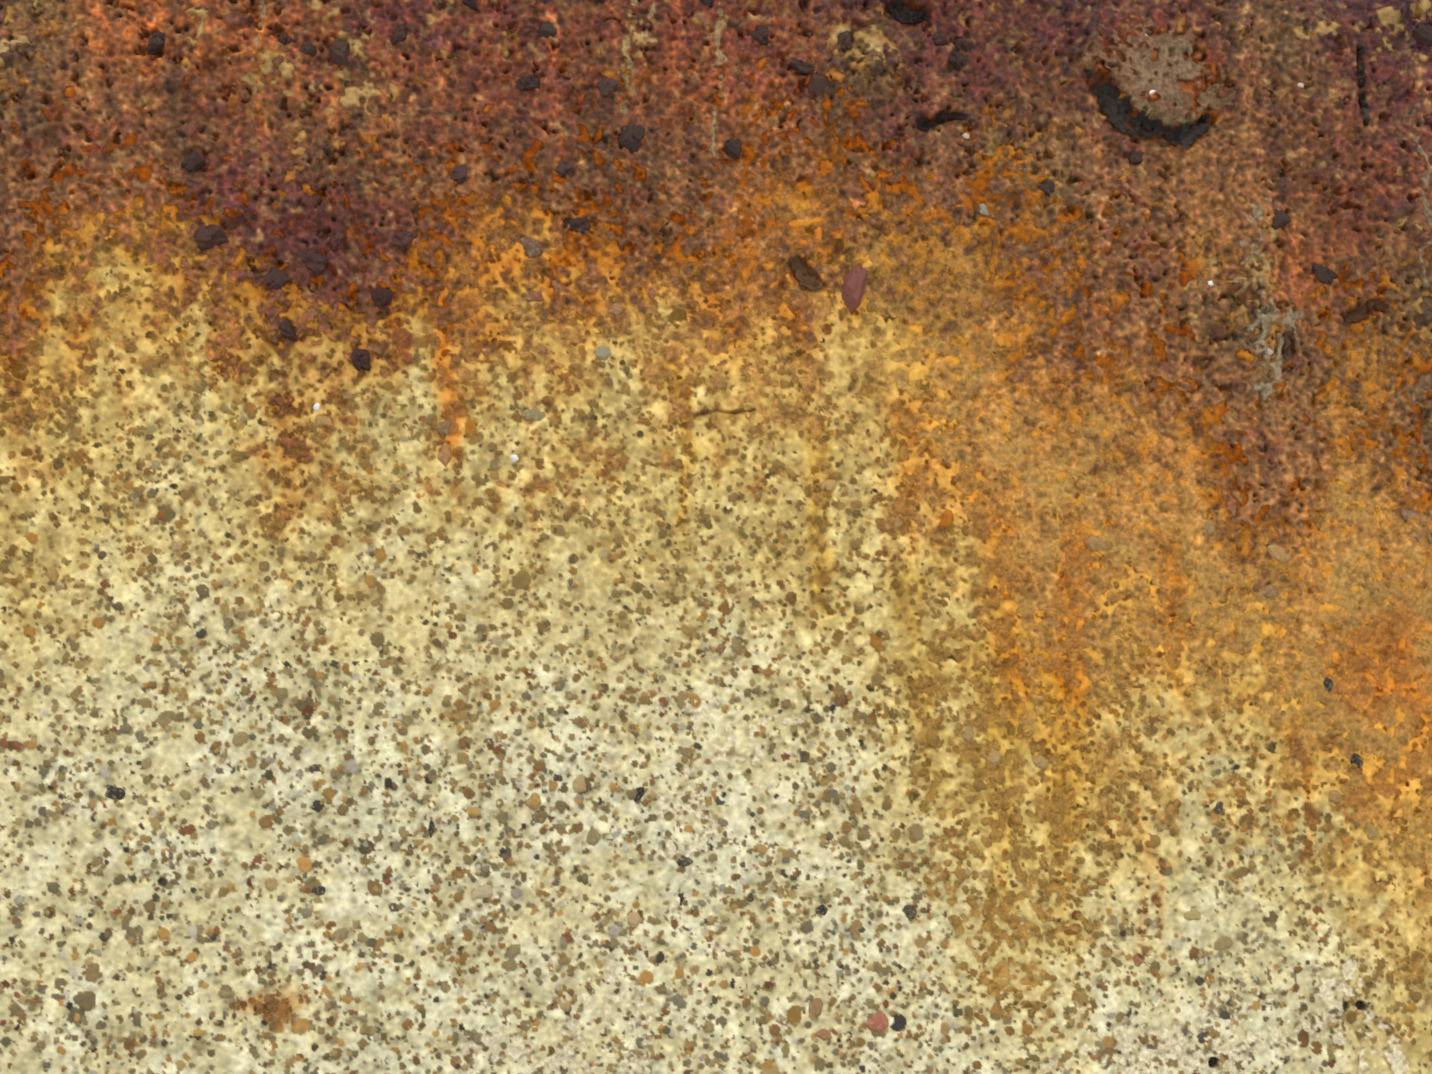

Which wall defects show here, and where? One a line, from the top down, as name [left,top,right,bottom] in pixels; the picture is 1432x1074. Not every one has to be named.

rust [139,339,203,378]
rust [298,353,341,378]
rust [265,369,312,418]
rust [533,382,560,421]
rust [259,385,373,538]
rust [418,451,465,499]
rust [523,429,622,522]
rust [881,465,956,557]
rust [1073,731,1181,845]
rust [1265,799,1321,832]
rust [1341,835,1386,896]
rust [1140,886,1164,934]